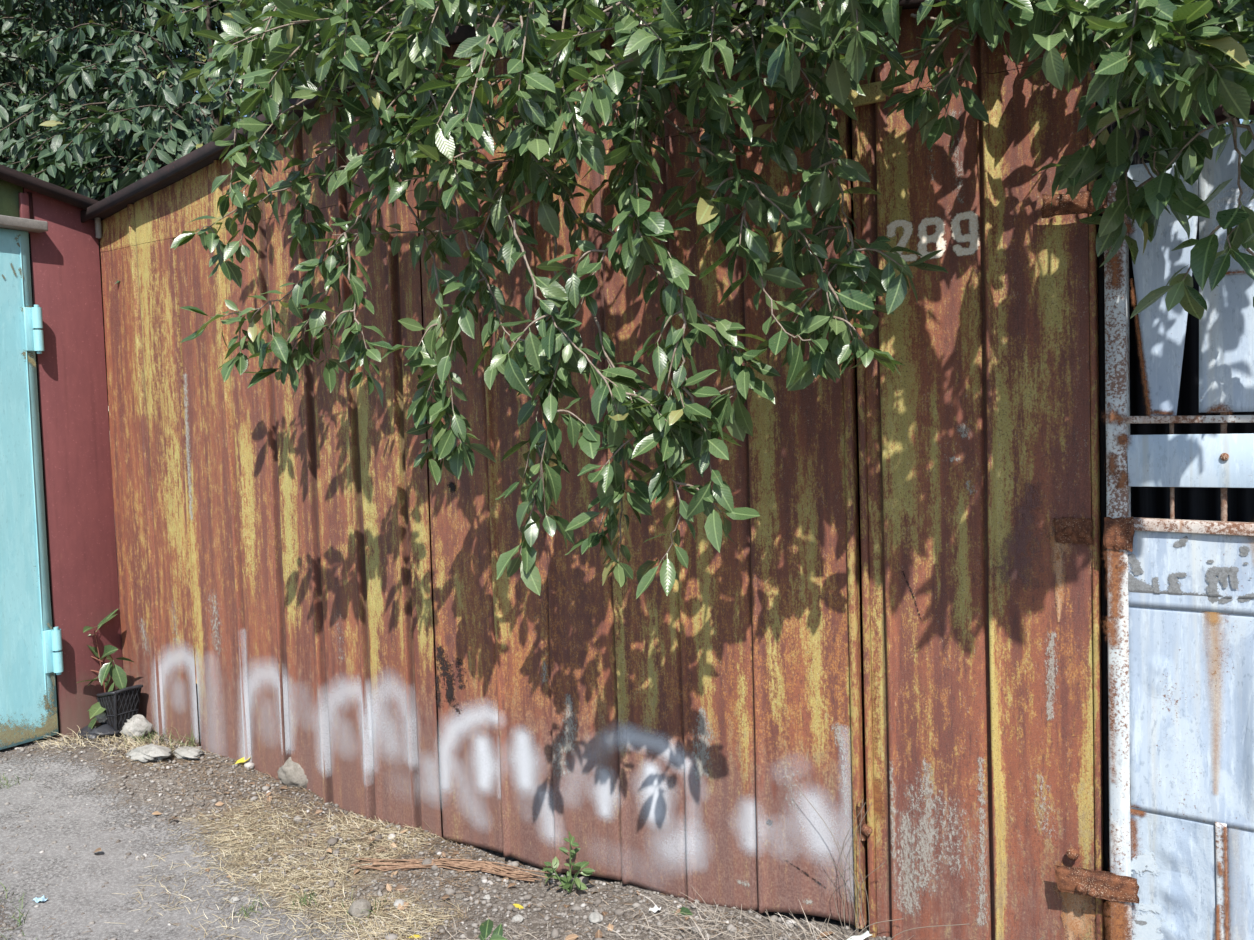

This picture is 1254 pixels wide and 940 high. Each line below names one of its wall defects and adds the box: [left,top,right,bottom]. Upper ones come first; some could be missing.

rust [1104,409,1131,491]
rust [1049,521,1128,647]
peeling [1128,546,1254,604]
peeling [0,673,58,748]
rust [873,778,885,818]
peeling [889,757,990,925]
rust [1130,805,1146,859]
rust [1054,883,1133,940]